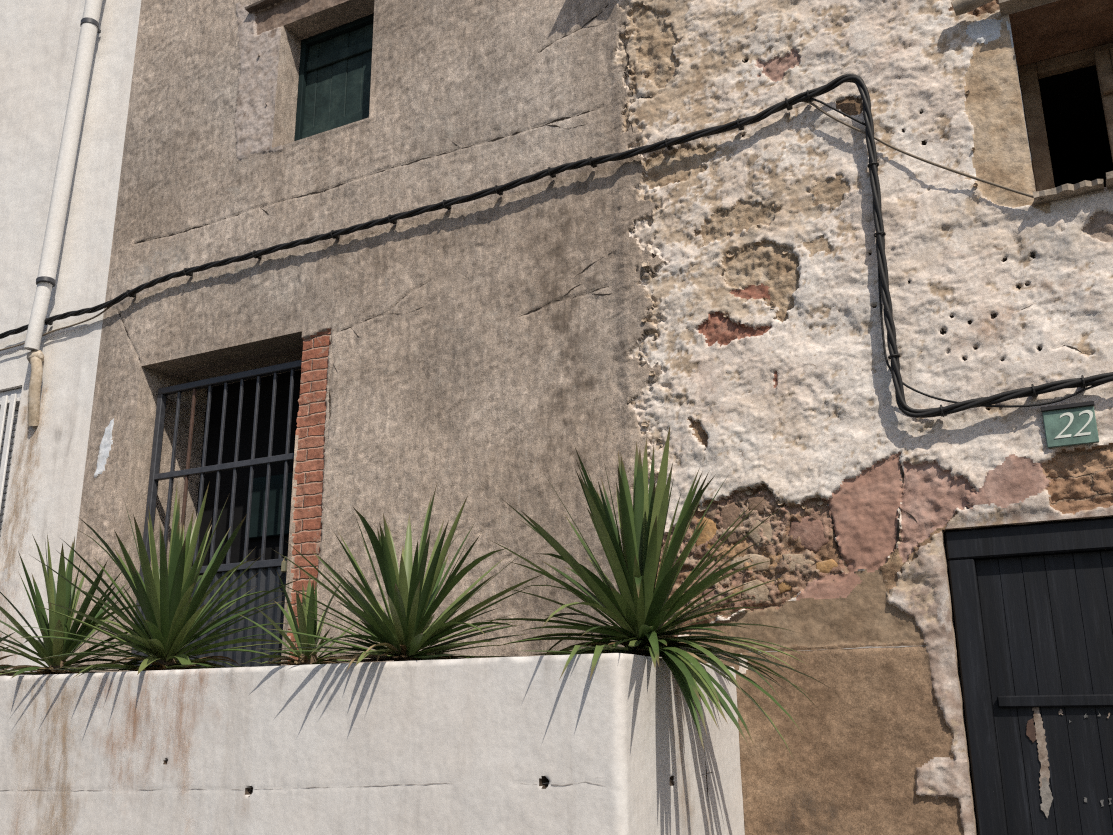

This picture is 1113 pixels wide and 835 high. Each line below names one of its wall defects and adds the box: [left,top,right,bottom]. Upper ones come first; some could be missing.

flaking render [948,0,1000,17]
flaking render [742,48,801,82]
flaking render [963,24,1052,213]
crack [519,252,612,317]
flaking render [602,0,721,549]
flaking render [694,200,832,347]
flaking render [1081,210,1113,242]
flaking render [655,443,1113,649]
crack [892,459,917,558]